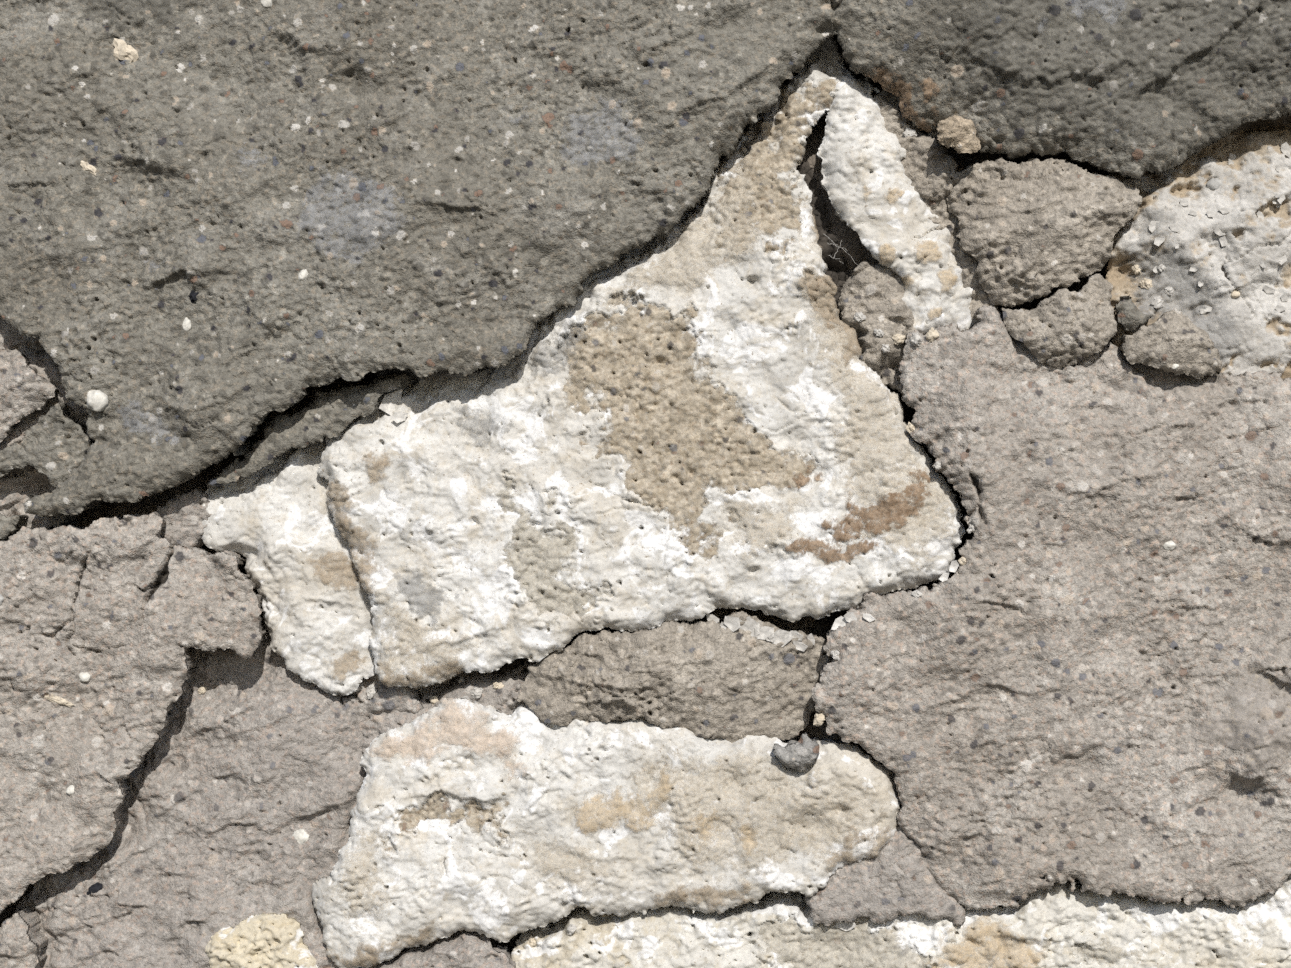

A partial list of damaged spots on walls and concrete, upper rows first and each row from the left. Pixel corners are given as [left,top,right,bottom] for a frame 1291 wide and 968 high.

spalling [716,79,837,255]
crack [796,161,862,359]
crack [997,261,1109,311]
spalling [497,479,613,632]
spalling [553,295,817,560]
crack [886,386,981,582]
crack [491,658,529,675]
peeling [706,614,815,652]
crack [808,603,861,663]
spalling [12,591,424,968]
spalling [398,792,510,846]
crack [490,933,521,953]